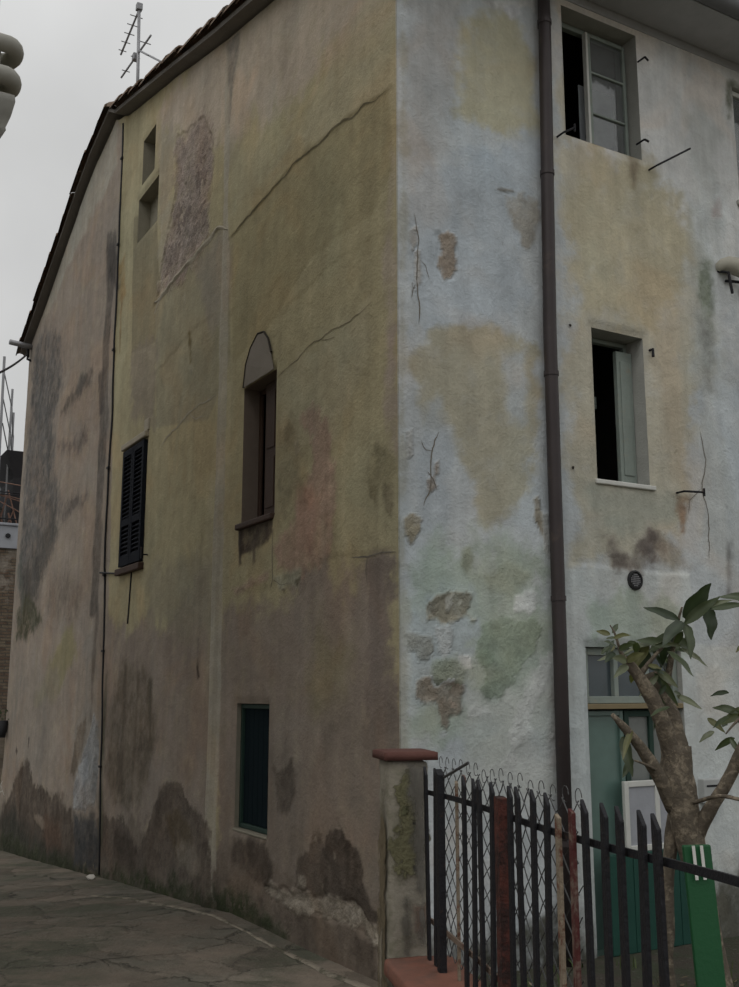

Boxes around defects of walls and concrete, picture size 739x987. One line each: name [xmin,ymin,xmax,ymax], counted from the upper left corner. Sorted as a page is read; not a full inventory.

crack [412,213,429,320]
flaking render [406,224,459,293]
crack [276,304,369,382]
crack [421,432,439,503]
crack [688,426,710,551]
damp [594,523,698,585]
damp [14,226,397,987]
flaking render [404,587,495,733]
peeling [500,648,556,780]
flaking render [263,872,379,952]
damp [515,898,559,971]
damp [713,849,739,938]